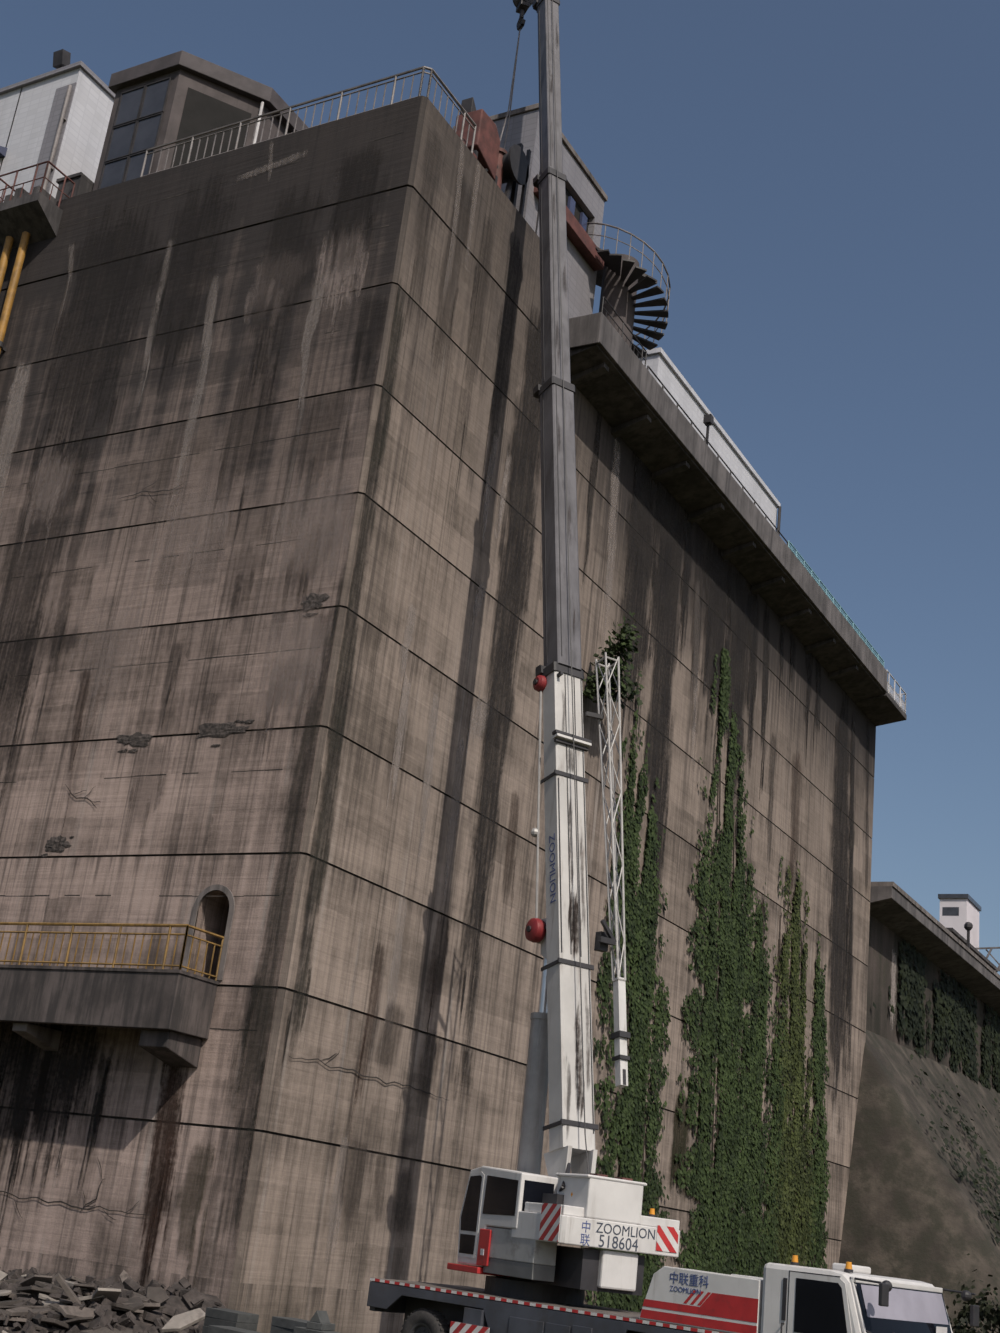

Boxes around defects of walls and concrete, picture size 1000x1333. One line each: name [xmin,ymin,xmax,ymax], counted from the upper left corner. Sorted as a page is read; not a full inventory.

efflorescence [0,367,29,493]
spalling [300,593,330,617]
damp [461,243,542,1024]
spalling [117,732,153,753]
spalling [197,719,255,747]
damp [621,453,821,936]
spalling [41,835,74,857]
damp [828,696,869,1127]
damp [79,1060,110,1179]